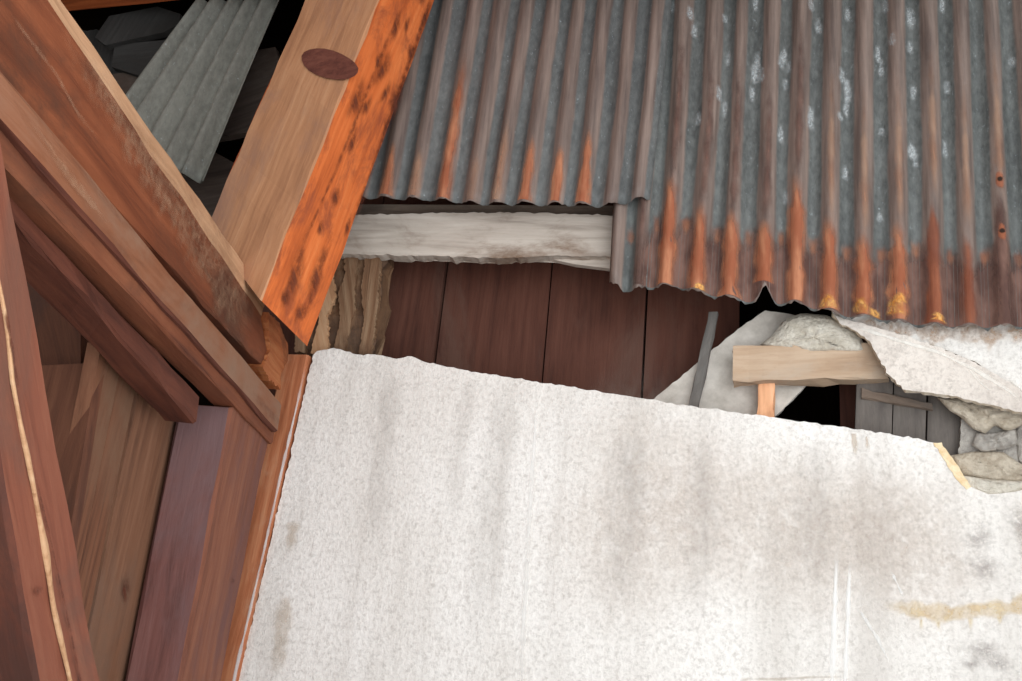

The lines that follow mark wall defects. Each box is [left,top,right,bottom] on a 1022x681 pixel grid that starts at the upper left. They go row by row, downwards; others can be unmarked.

corrosion [379,150,393,195]
corrosion [408,159,420,195]
corrosion [438,83,462,199]
corrosion [494,141,506,199]
corrosion [518,147,533,200]
corrosion [550,152,563,201]
corrosion [575,139,591,203]
corrosion [636,186,1022,340]
flaking render [833,315,1022,494]